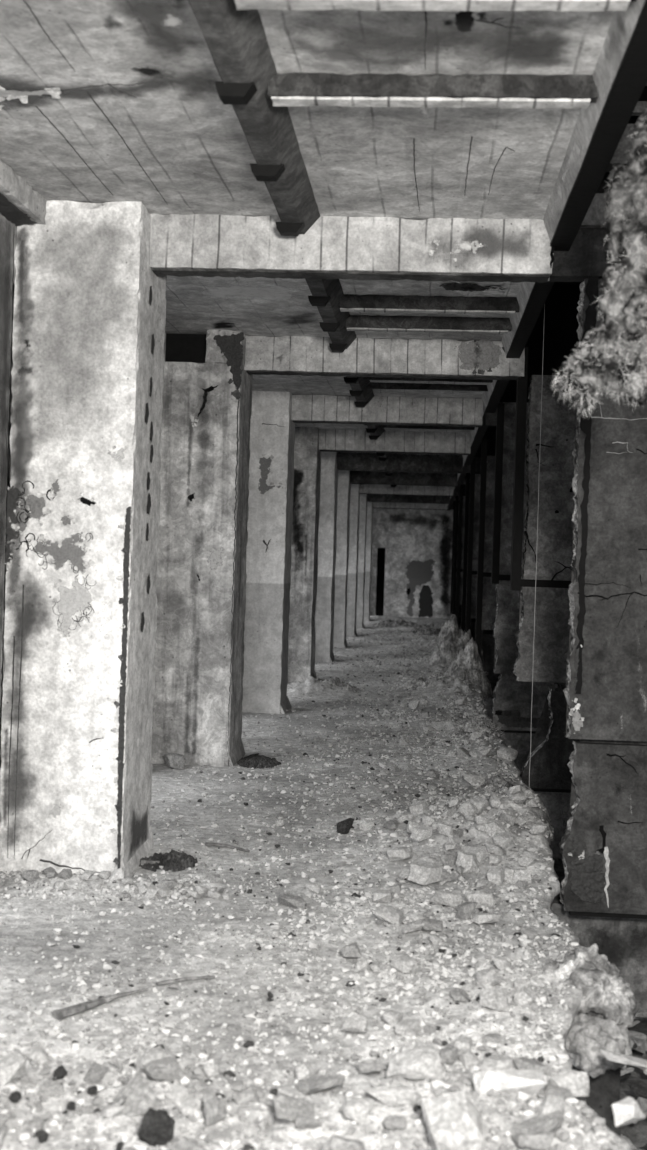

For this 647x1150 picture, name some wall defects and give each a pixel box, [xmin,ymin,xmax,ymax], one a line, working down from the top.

water stain [298,13,565,69]
peeling [0,86,61,111]
spalling [151,332,244,400]
spalling [145,377,153,541]
peeling [4,479,97,637]
peeling [405,559,435,617]
crack [524,531,647,630]
spalling [111,507,145,869]
spalling [568,833,606,903]